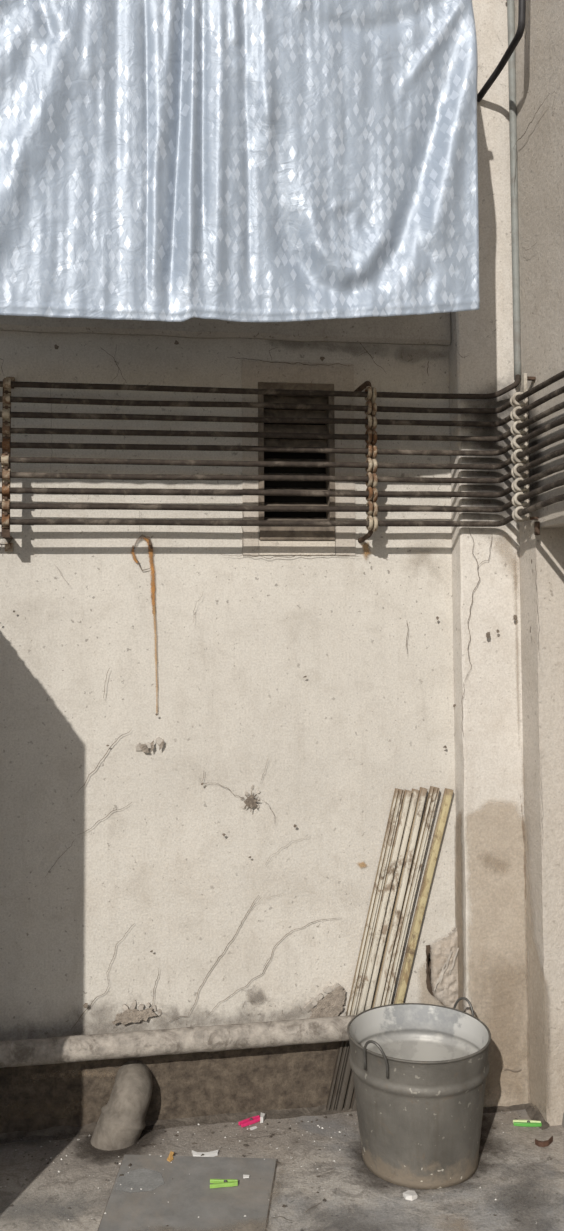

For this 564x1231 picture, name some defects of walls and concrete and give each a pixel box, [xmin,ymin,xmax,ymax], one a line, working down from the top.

rust [132,535,158,713]
crack [461,527,492,737]
crack [72,923,135,1028]
crack [151,893,336,1022]
peeling [303,983,346,1018]
water stain [455,803,548,1176]